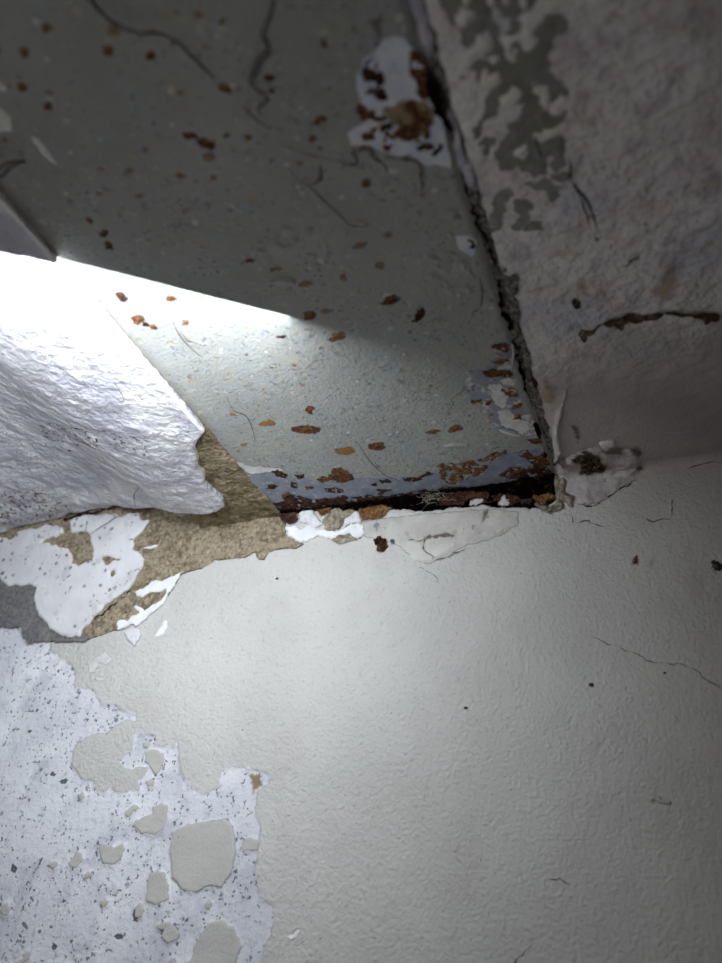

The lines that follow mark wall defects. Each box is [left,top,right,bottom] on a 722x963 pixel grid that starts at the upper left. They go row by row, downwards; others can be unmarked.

corrosion [182,132,229,161]
crack [420,14,547,462]
corrosion [131,315,157,330]
corrosion [303,309,332,320]
corrosion [328,332,346,342]
corrosion [380,295,401,305]
corrosion [411,308,426,322]
crack [578,311,722,343]
corrosion [273,438,552,520]
peeling [0,343,574,963]